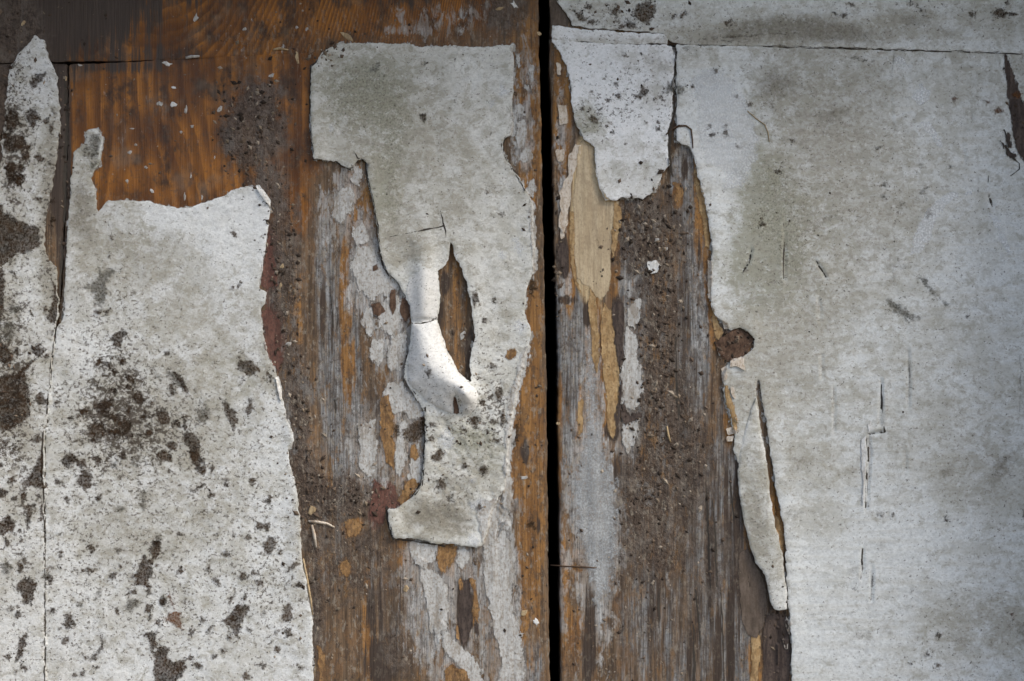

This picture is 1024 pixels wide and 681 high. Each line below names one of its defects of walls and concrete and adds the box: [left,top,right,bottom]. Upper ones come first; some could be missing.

peeling [0,35,316,681]
peeling [309,32,539,681]
peeling [537,0,1024,681]
crack [865,384,886,508]